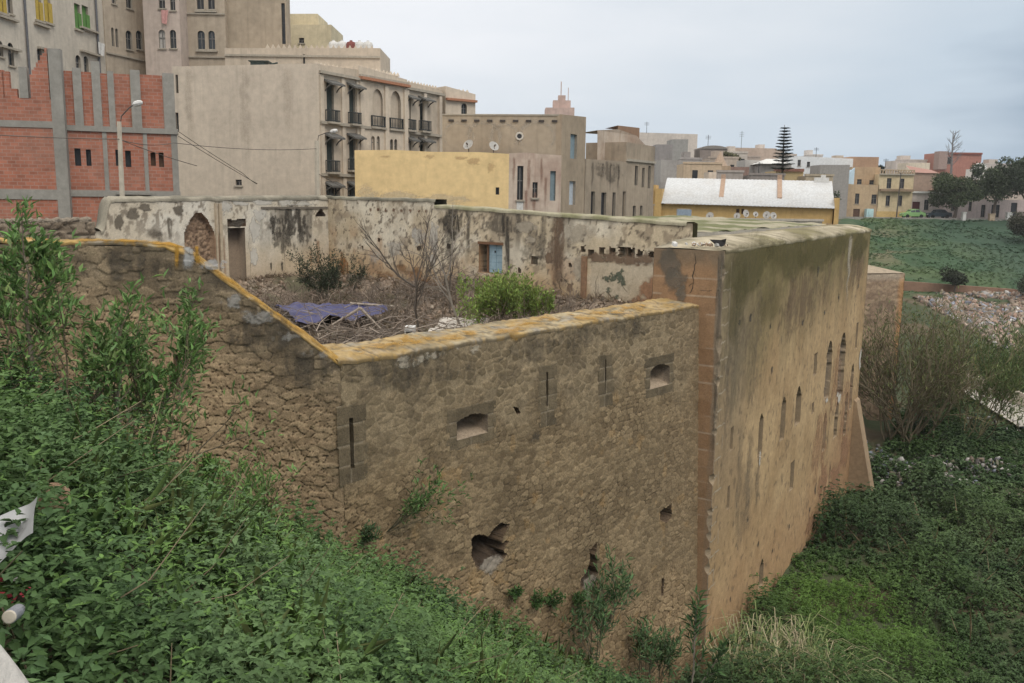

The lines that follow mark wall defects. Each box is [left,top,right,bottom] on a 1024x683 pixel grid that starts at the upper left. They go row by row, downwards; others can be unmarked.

flaking render [114,203,152,230]
damp [270,206,311,250]
damp [482,214,525,270]
damp [532,217,564,282]
spalling [581,245,654,266]
spalling [631,278,653,303]
damp [659,247,687,301]
hole [471,522,510,574]
hole [580,542,598,594]